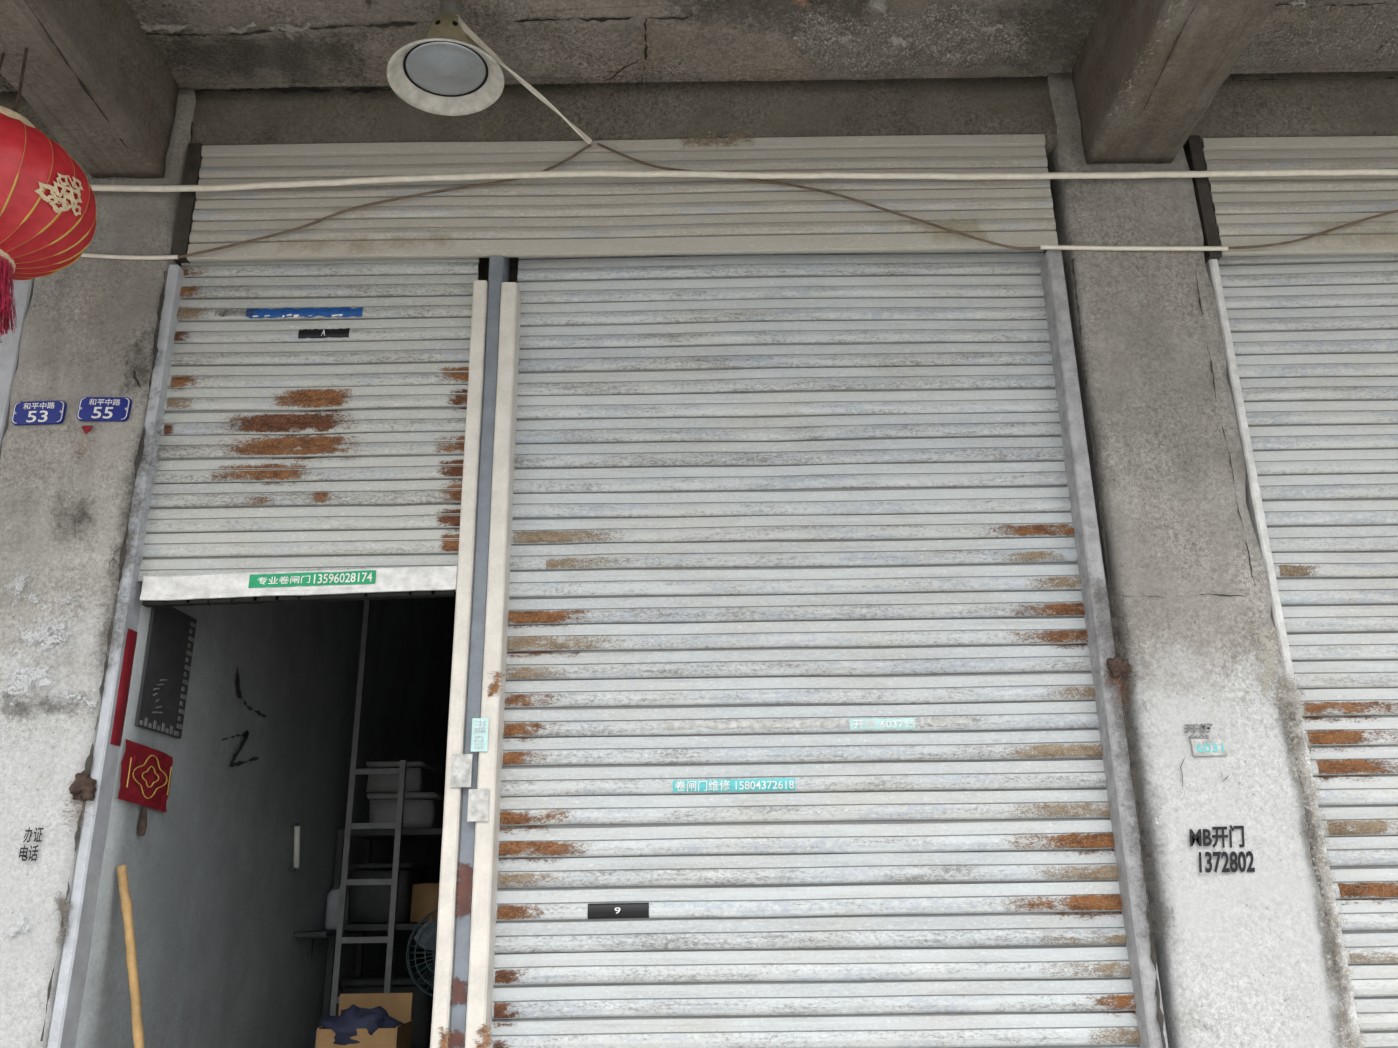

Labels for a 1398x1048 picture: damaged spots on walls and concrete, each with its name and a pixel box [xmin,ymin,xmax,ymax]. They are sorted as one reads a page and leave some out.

crack [484,15,696,83]
water stain [669,0,869,36]
crack [1224,3,1398,82]
corrosion [211,389,363,505]
corrosion [987,524,1088,649]
corrosion [488,610,619,765]
corrosion [1302,701,1398,782]
corrosion [497,904,544,920]
corrosion [498,811,588,887]
corrosion [1003,802,1122,920]
corrosion [1324,820,1398,835]
corrosion [1337,882,1398,905]